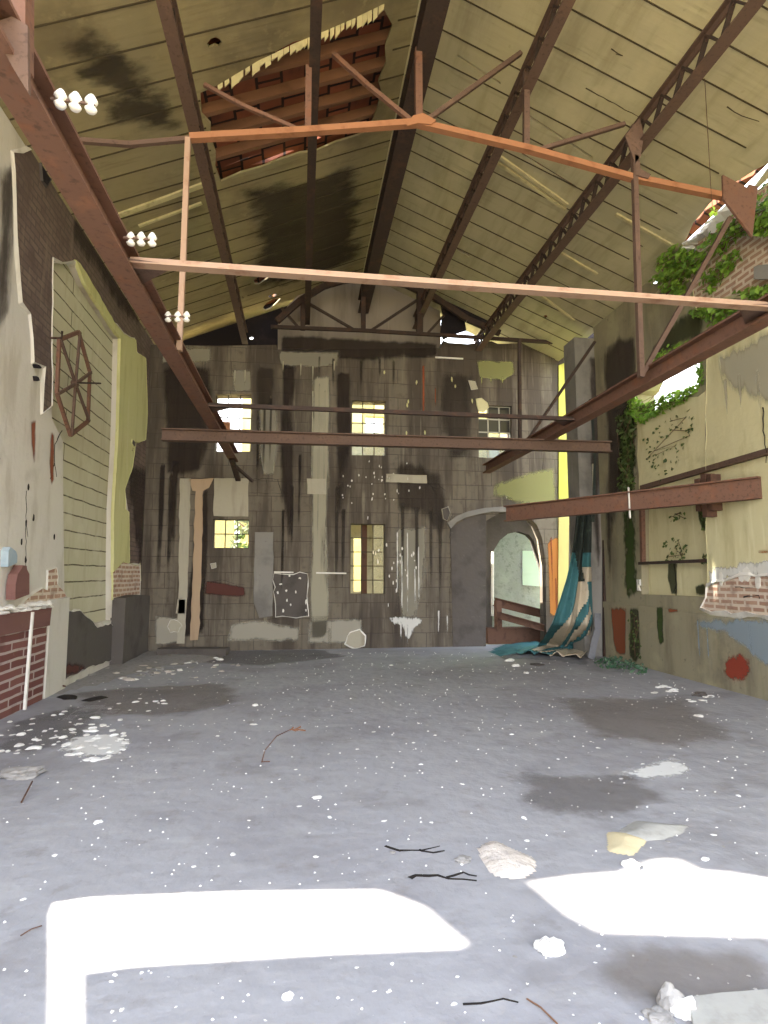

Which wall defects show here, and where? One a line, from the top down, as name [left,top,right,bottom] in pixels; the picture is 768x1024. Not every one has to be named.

damp [73,33,169,126]
spalling [10,146,154,600]
damp [163,356,208,429]
damp [186,348,210,395]
damp [233,336,436,433]
spalling [21,567,66,607]
damp [157,442,207,563]
damp [229,444,361,643]
damp [390,464,445,639]
flaking render [637,327,768,664]